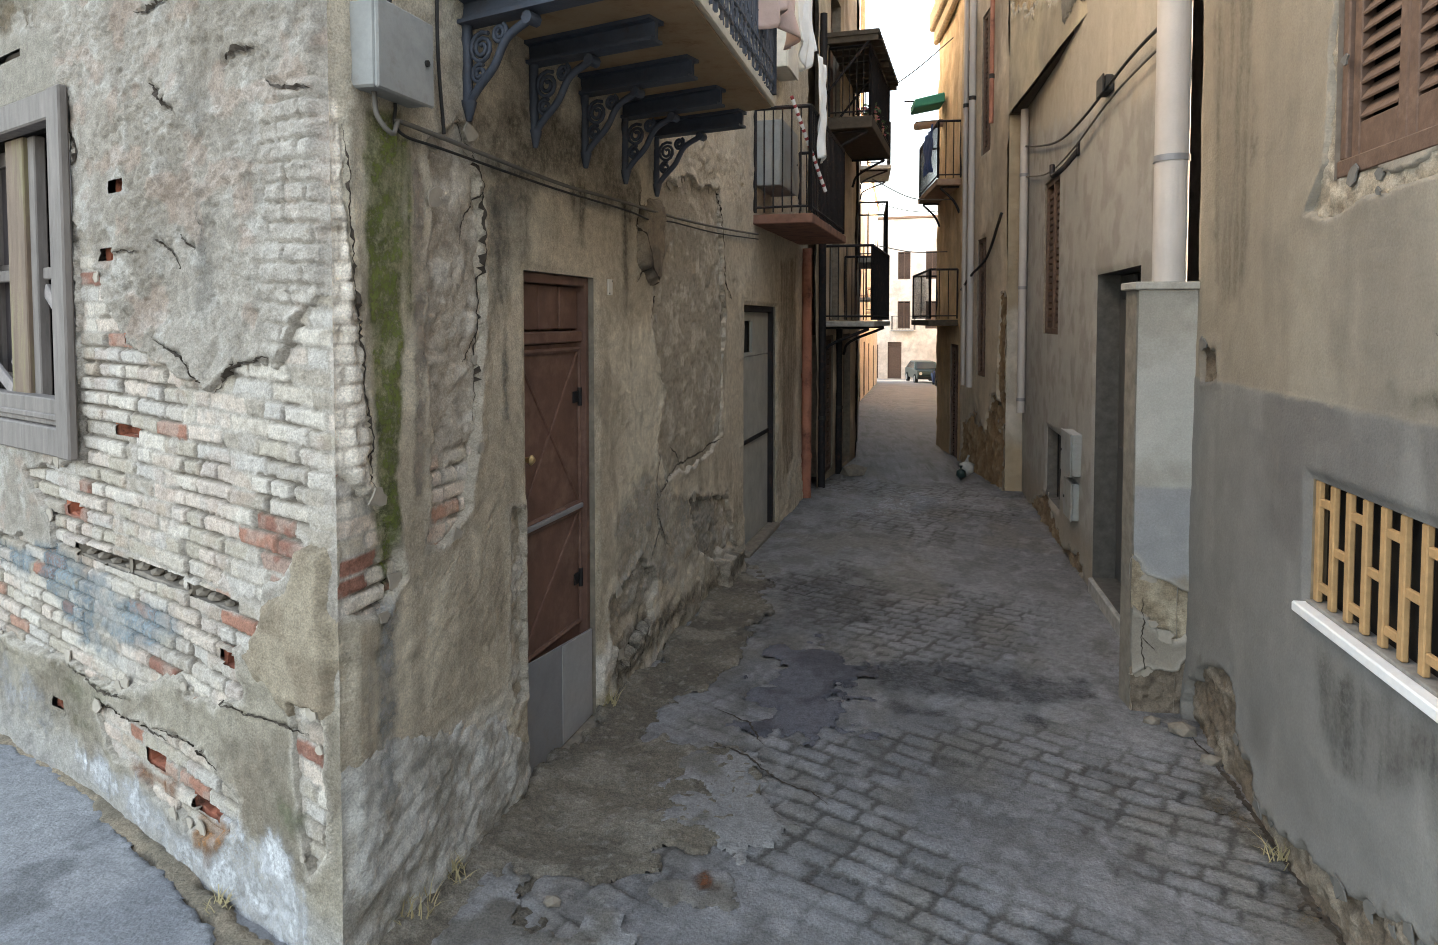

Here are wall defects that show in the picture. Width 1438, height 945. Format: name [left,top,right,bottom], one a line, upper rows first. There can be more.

crack [148,83,173,111]
crack [225,44,254,60]
crack [266,80,310,90]
spalling [1314,101,1438,218]
flaking render [0,227,401,836]
spalling [689,491,735,565]
spalling [608,561,653,660]
spalling [1129,552,1188,644]
crack [69,666,217,771]
crack [218,700,309,735]
spalling [294,705,328,869]
spalling [1129,662,1438,945]